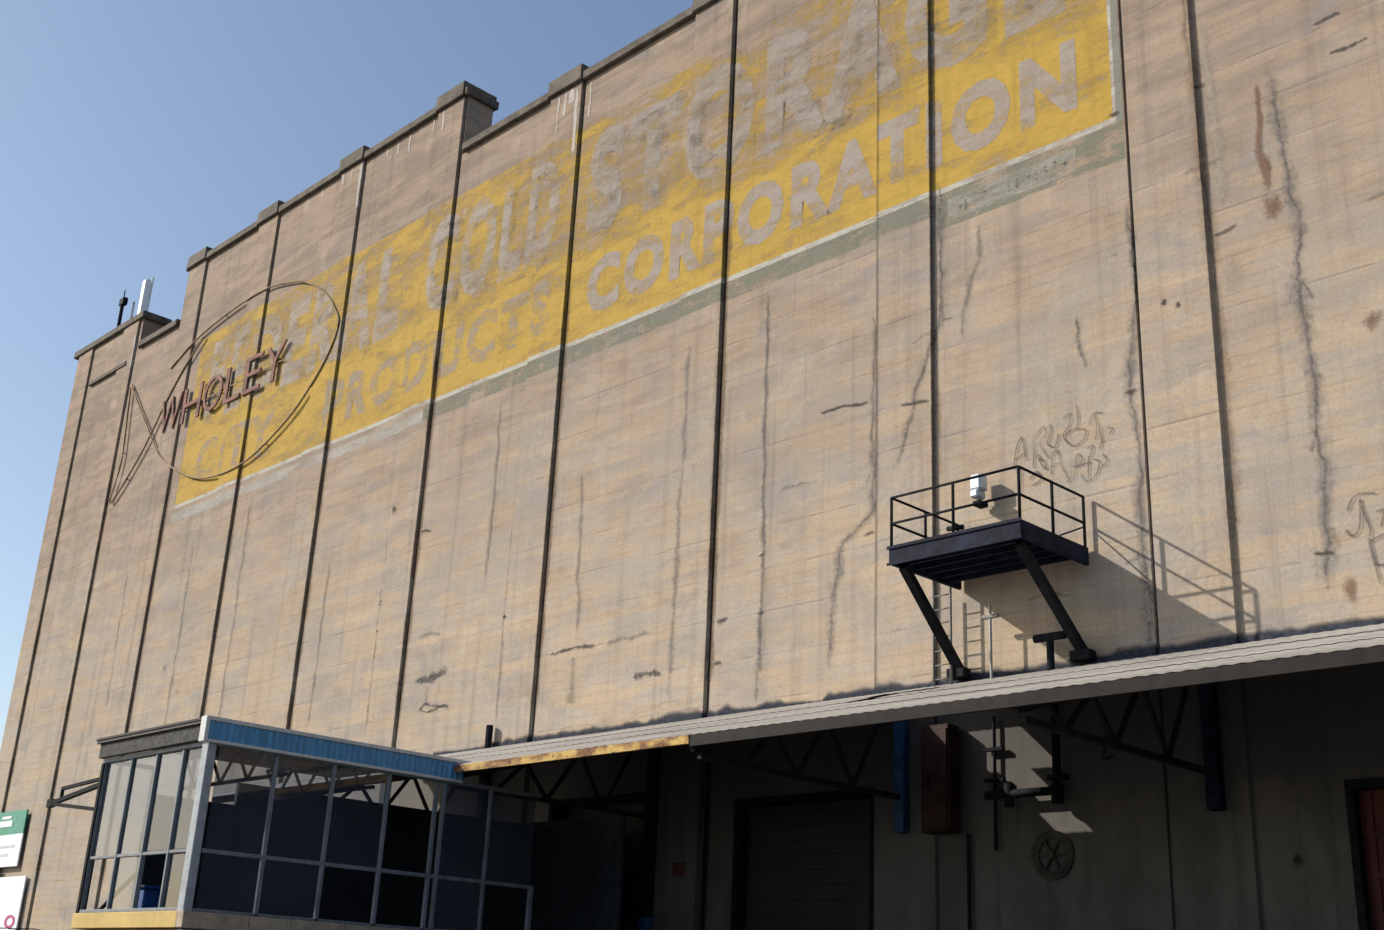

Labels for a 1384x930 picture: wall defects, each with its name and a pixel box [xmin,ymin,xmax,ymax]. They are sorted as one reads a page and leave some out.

crack [820,199,951,442]
crack [1272,100,1333,567]